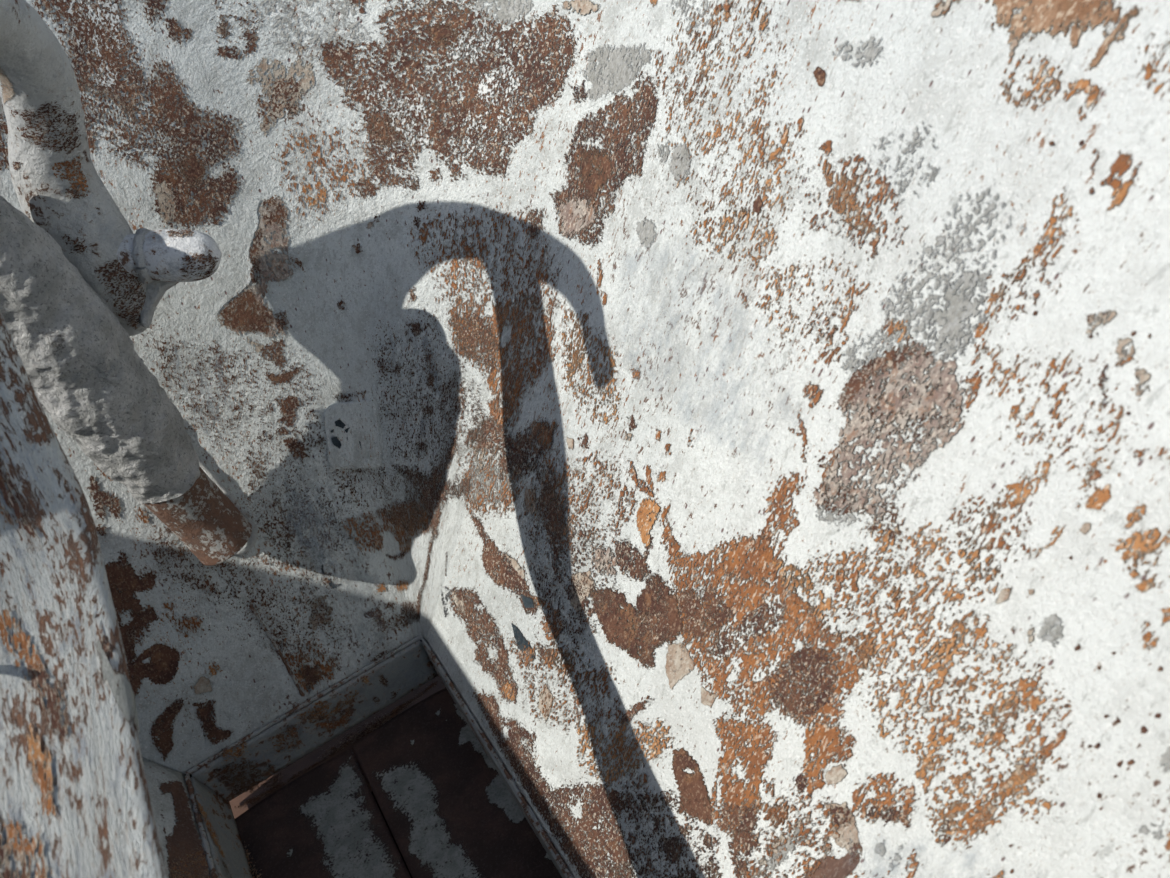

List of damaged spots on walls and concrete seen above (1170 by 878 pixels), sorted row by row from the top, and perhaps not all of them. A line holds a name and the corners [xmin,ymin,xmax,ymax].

rust [271,0,600,228]
spalling [579,42,653,108]
rust [549,0,909,366]
rust [1088,149,1142,212]
peeling [811,179,1029,524]
rust [105,184,1130,878]
rust [1115,503,1170,593]
peeling [511,623,535,662]
peeling [665,643,694,690]
spalling [1027,614,1064,647]
rust [0,609,68,878]
peeling [804,801,906,878]